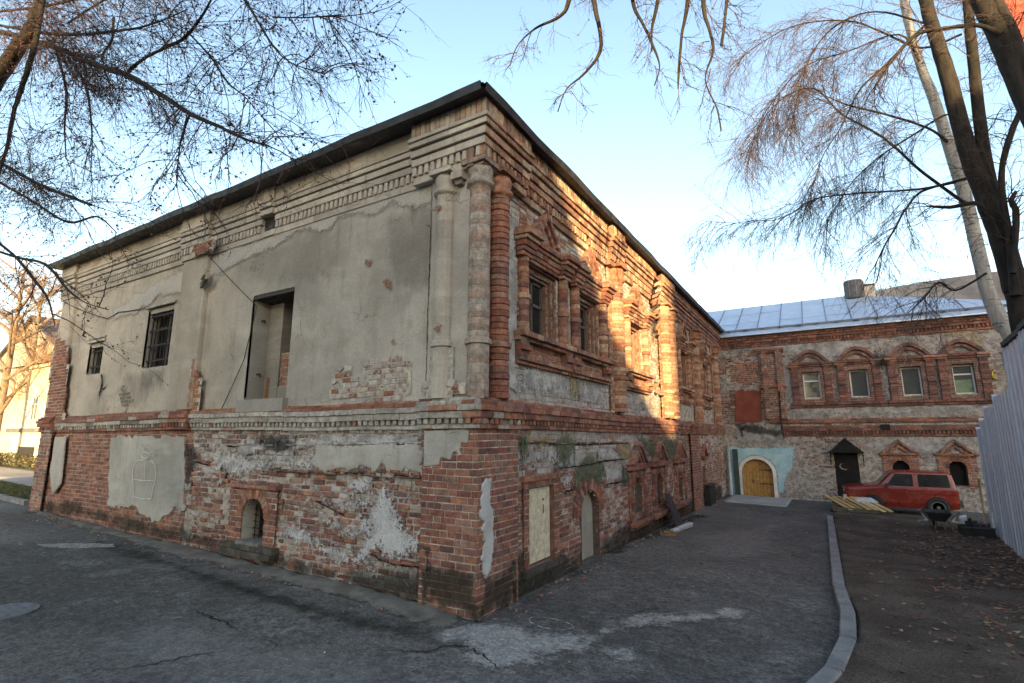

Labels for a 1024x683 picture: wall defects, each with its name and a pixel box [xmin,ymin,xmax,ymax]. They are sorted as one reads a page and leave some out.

peeling [329,340,429,403]
peeling [194,431,432,574]